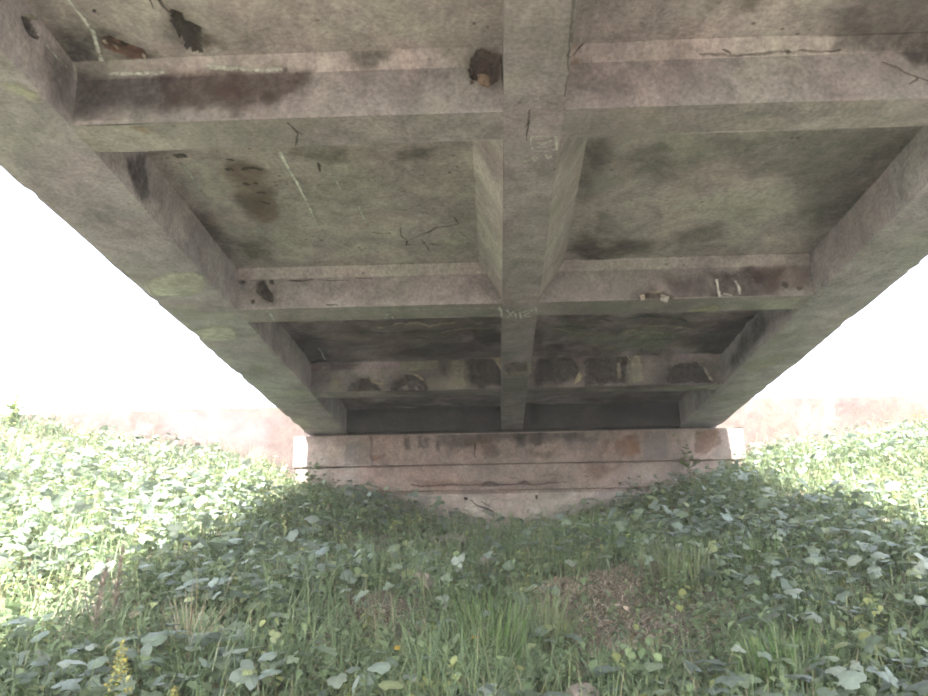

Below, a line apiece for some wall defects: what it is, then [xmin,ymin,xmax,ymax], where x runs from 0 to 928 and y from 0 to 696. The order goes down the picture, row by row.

spalling [16,4,46,50]
water stain [63,36,306,114]
spalling [158,2,216,57]
spalling [460,46,502,91]
crack [564,0,584,97]
crack [703,49,839,57]
water stain [839,0,928,63]
crack [882,61,928,84]
crack [372,218,458,252]
spalling [343,371,435,391]
spalling [458,357,531,388]
spalling [661,358,718,384]